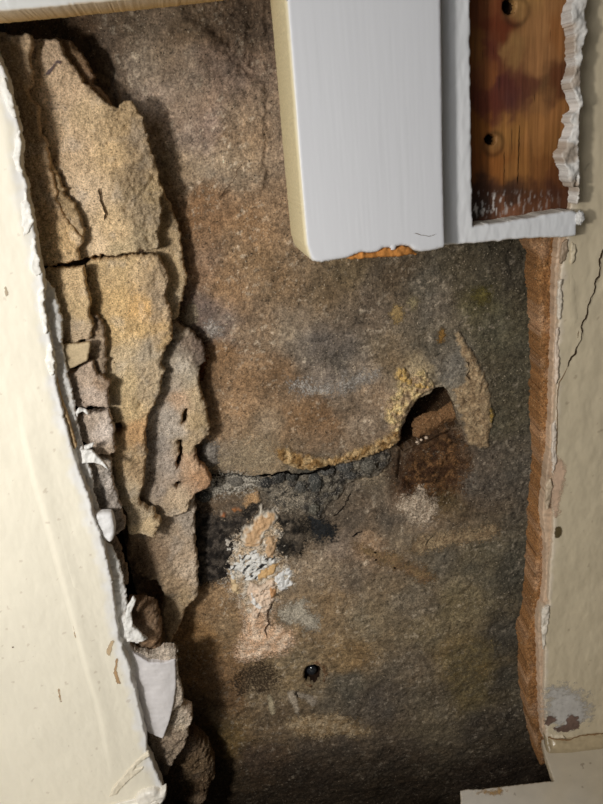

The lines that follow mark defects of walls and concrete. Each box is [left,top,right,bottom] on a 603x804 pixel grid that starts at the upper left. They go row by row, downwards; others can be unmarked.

peeling [0,78,17,117]
peeling [13,130,23,173]
peeling [21,192,42,276]
crack [556,203,603,455]
spalling [398,387,458,450]
peeling [81,442,109,469]
damp [195,365,434,587]
damp [353,484,502,585]
damp [273,598,321,633]
peeling [124,596,184,738]
damp [230,659,282,696]
damp [283,710,374,740]